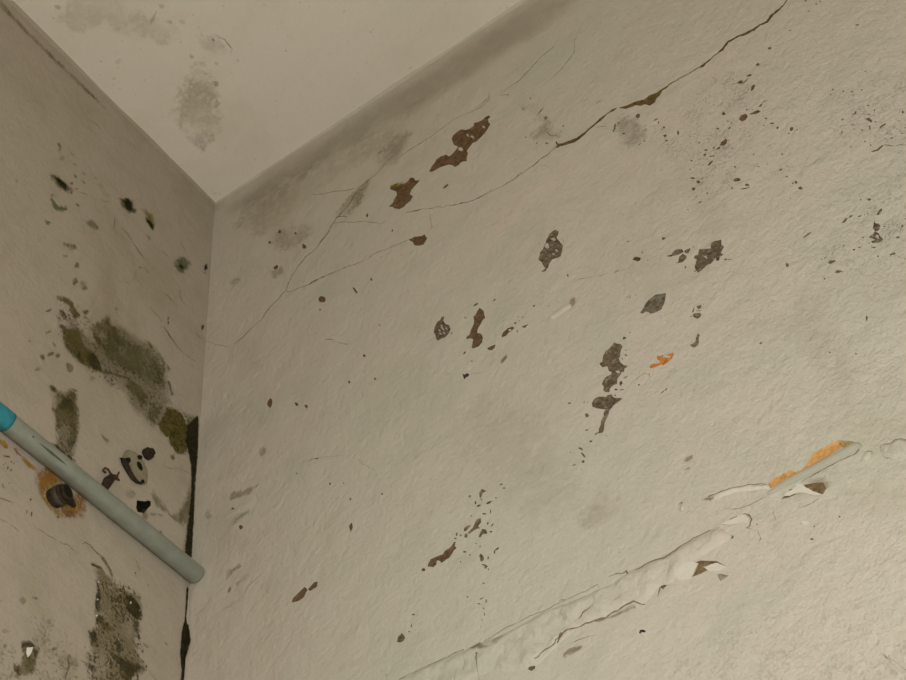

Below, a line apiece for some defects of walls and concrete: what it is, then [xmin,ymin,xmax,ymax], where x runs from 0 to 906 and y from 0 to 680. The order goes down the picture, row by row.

flaking render [430,116,490,172]
crack [406,0,787,214]
water stain [121,198,154,228]
flaking render [667,240,731,273]
water stain [52,387,79,460]
water stain [41,297,173,424]
flaking render [463,303,528,362]
flaking render [570,332,650,470]
rust [0,440,62,503]
crack [180,416,199,558]
water stain [82,542,147,680]
crack [180,587,191,680]